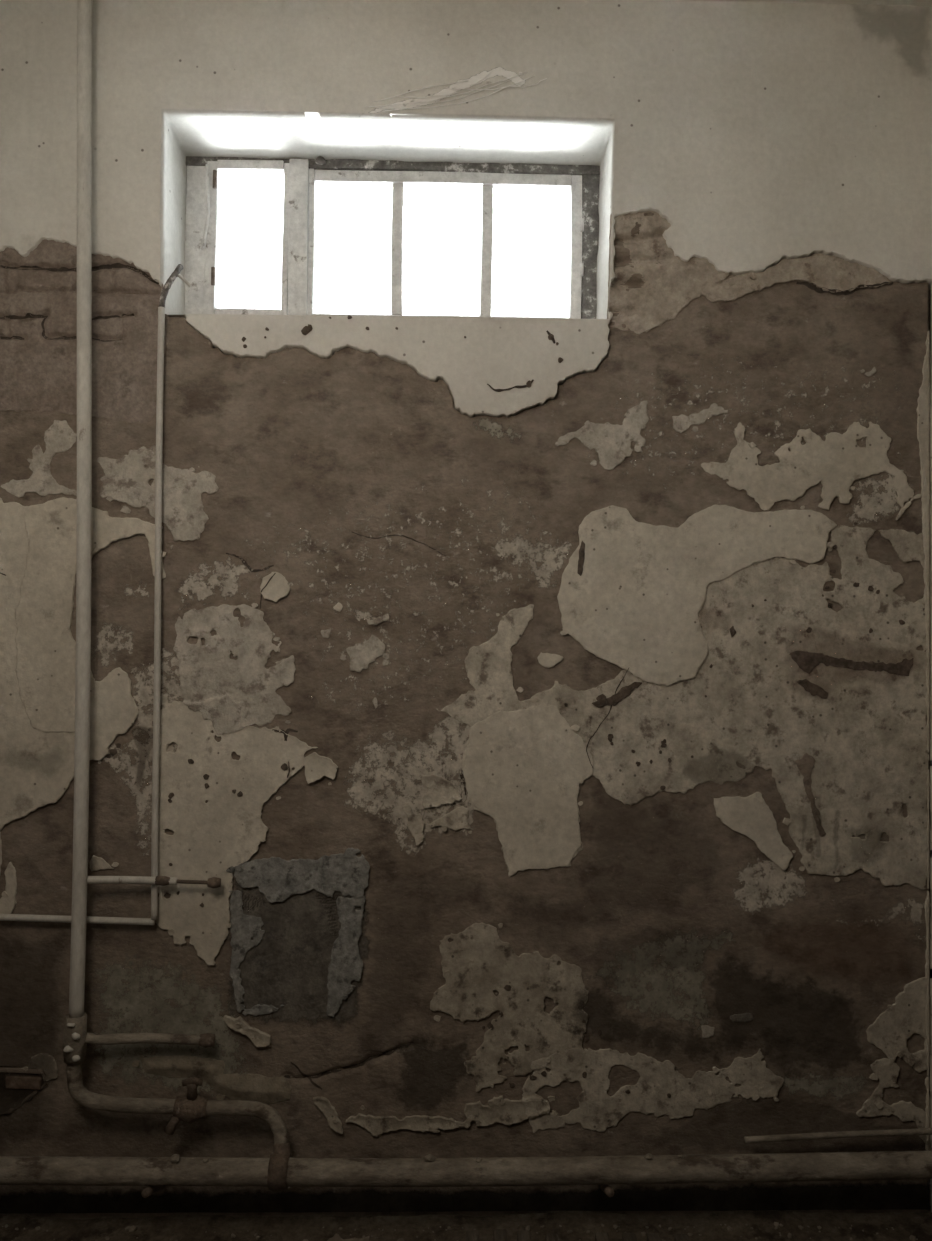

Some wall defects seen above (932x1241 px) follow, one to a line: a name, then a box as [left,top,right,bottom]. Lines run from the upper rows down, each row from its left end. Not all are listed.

flaking render [0,211,932,1158]
crack [284,1044,411,1090]
flaking render [0,1179,928,1196]